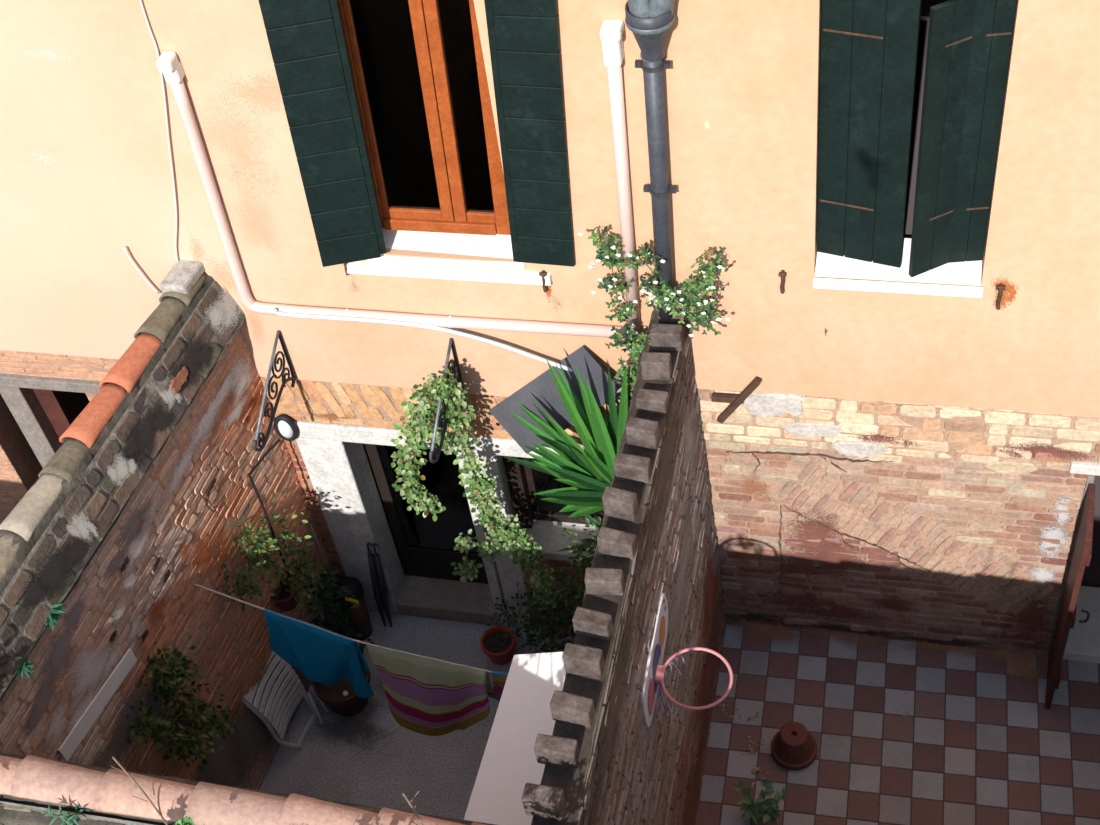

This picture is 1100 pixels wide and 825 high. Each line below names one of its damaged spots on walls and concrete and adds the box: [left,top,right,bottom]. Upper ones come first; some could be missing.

rust [991,277,1019,311]
flaking render [743,392,888,458]
crack [731,452,893,474]
leakage [18,231,265,768]
leakage [726,495,1071,652]